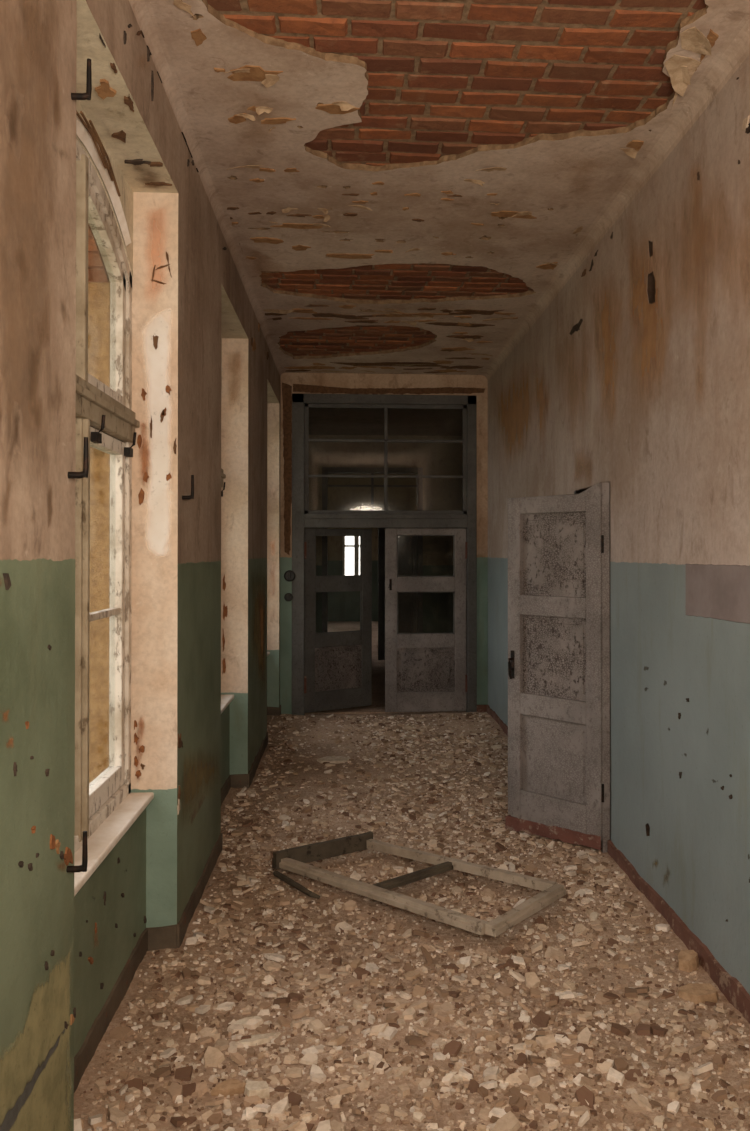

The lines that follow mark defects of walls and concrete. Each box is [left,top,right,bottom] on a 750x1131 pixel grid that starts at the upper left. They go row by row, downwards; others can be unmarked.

flaking render [174,0,719,556]
peeling [144,311,170,554]
peeling [0,950,82,1131]